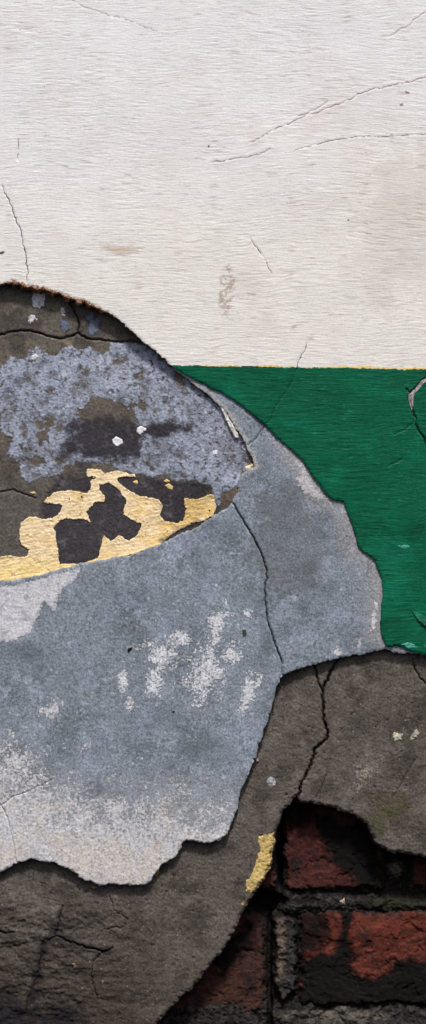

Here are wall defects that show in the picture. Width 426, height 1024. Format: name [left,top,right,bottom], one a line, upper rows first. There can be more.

crack [2,186,29,278]
crack [1,302,142,343]
spalling [0,281,426,1024]
crack [234,505,282,668]
crack [296,660,337,802]
crack [25,896,126,1009]